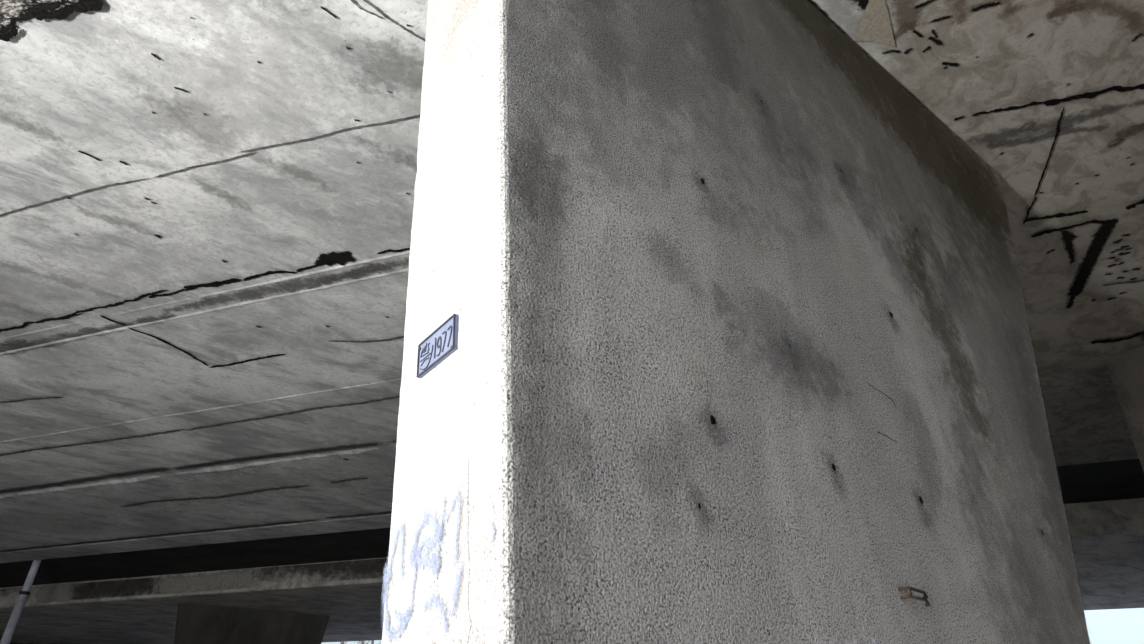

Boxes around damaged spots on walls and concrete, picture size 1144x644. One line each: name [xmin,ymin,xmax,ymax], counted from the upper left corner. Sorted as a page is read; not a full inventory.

spalling [0,0,104,42]
crack [807,0,845,34]
crack [0,115,420,217]
crack [954,84,1144,238]
crack [377,247,410,255]
crack [1102,278,1144,286]
crack [0,260,335,368]